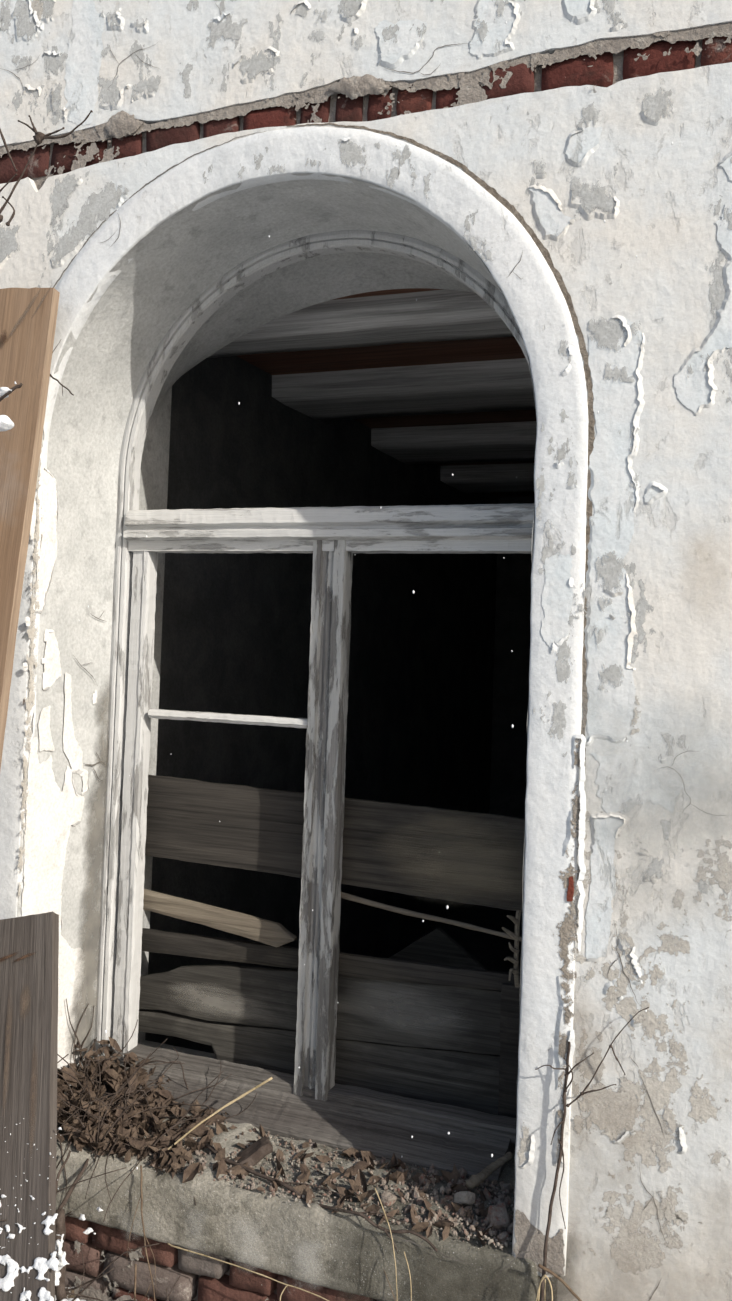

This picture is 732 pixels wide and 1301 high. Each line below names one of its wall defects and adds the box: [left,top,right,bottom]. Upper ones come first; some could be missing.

peeling [0,0,161,288]
peeling [179,64,193,98]
peeling [305,137,431,199]
peeling [468,0,525,60]
peeling [526,104,620,241]
peeling [640,89,673,126]
peeling [673,195,732,416]
peeling [17,445,89,1071]
peeling [533,315,732,1274]
peeling [123,1248,144,1292]
spalling [182,1135,565,1277]
spalling [517,1123,536,1169]